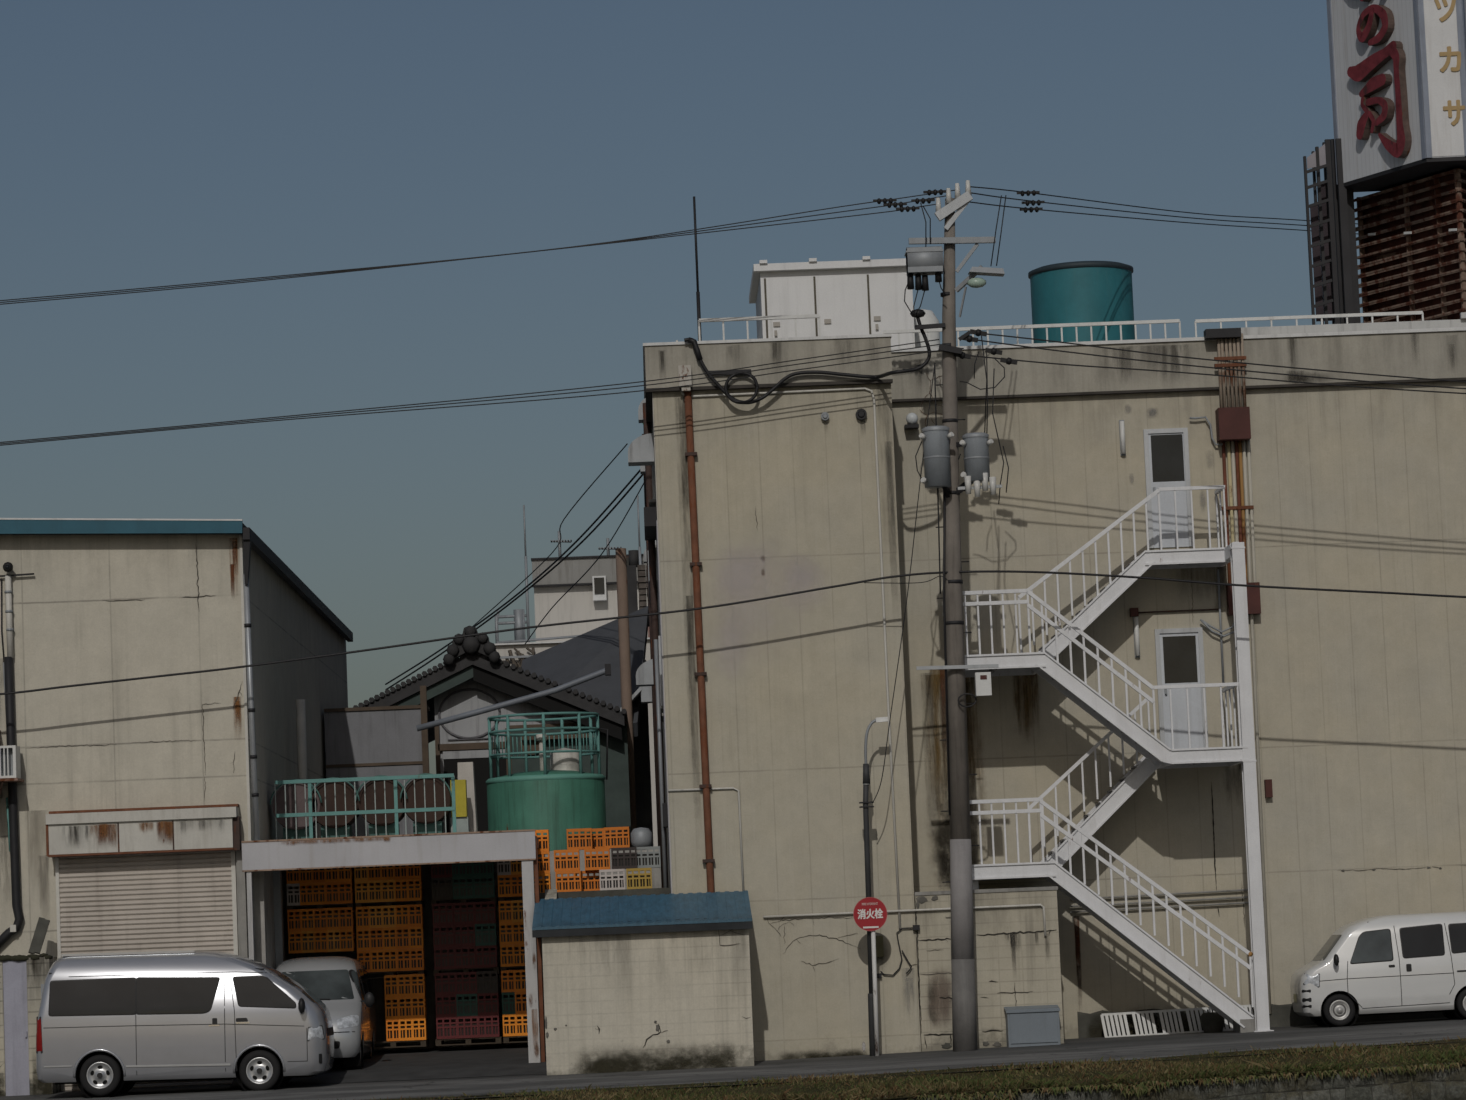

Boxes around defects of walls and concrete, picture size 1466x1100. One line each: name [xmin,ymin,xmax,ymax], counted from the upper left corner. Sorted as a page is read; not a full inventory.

damp [926,674,947,782]
damp [965,677,975,770]
rust [95,824,115,840]
rust [141,821,172,837]
crack [718,917,860,971]